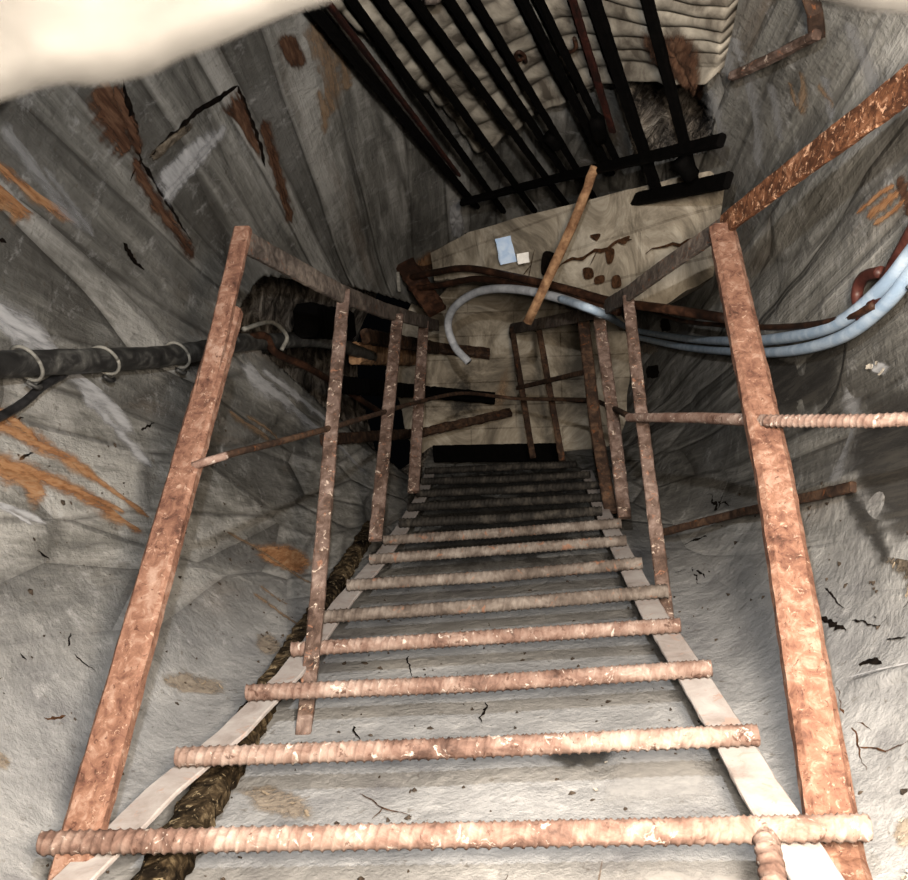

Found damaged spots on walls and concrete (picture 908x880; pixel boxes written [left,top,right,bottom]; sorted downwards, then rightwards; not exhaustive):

rust [278,23,352,133]
rust [0,163,73,222]
crack [123,81,193,243]
rust [260,120,293,223]
rust [856,176,908,225]
crack [123,243,144,270]
rust [0,409,149,533]
rust [228,532,311,583]
spalling [885,557,908,597]